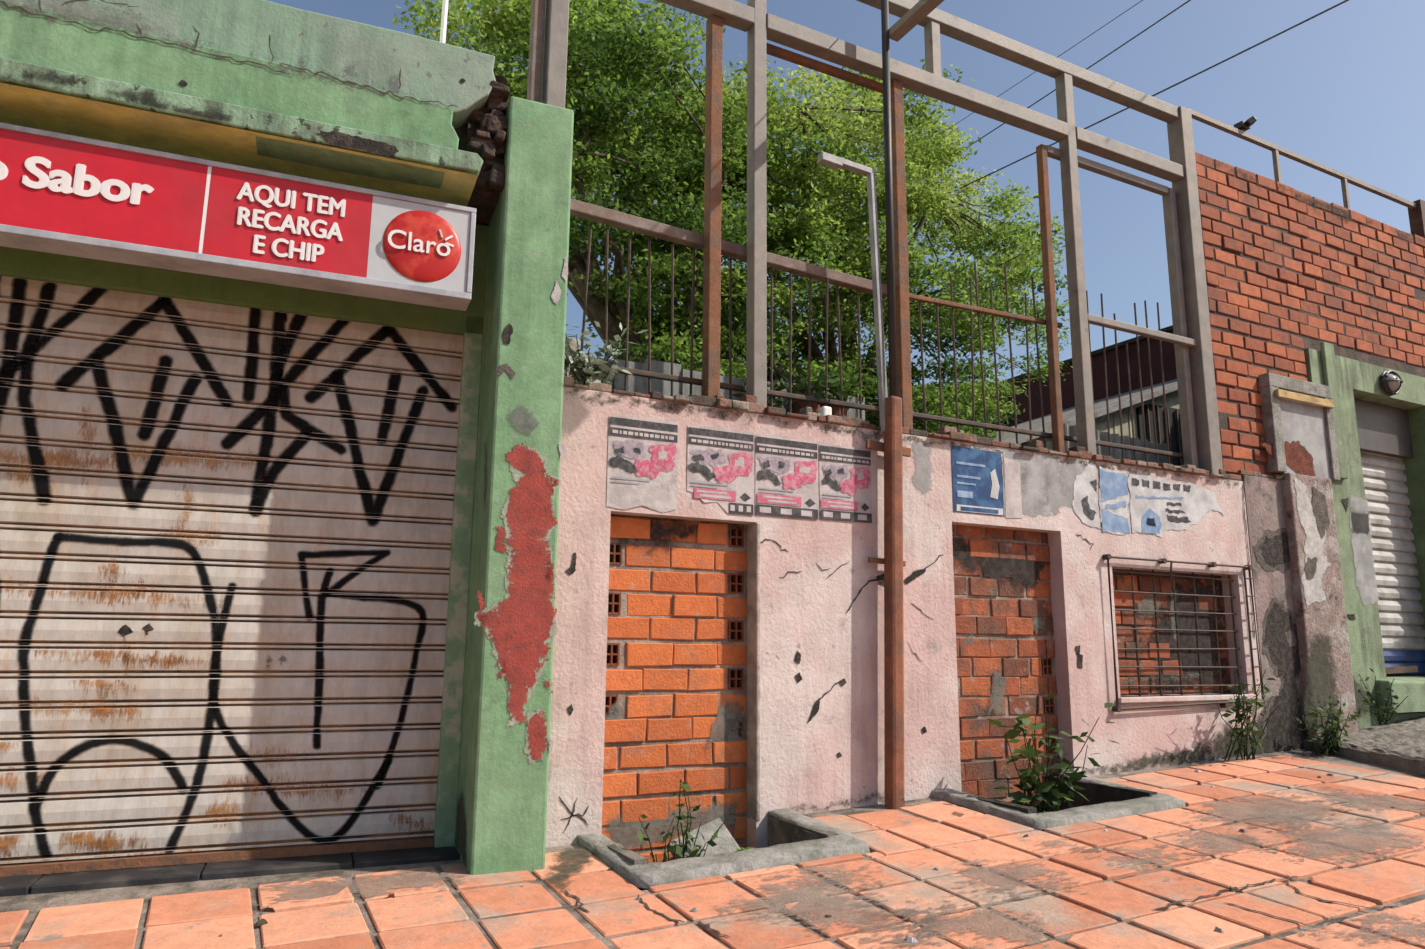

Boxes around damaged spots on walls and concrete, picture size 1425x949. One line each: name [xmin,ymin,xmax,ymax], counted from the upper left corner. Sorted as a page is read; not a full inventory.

crack [0,0,458,107]
spalling [466,75,510,192]
peeling [551,257,568,306]
corrosion [1,409,268,482]
corrosion [164,493,223,543]
corrosion [51,559,186,605]
peeling [474,441,577,764]
crack [754,539,878,613]
corrosion [31,647,184,718]
leakage [1303,636,1379,736]
corrosion [206,779,356,825]
corrosion [0,826,167,875]